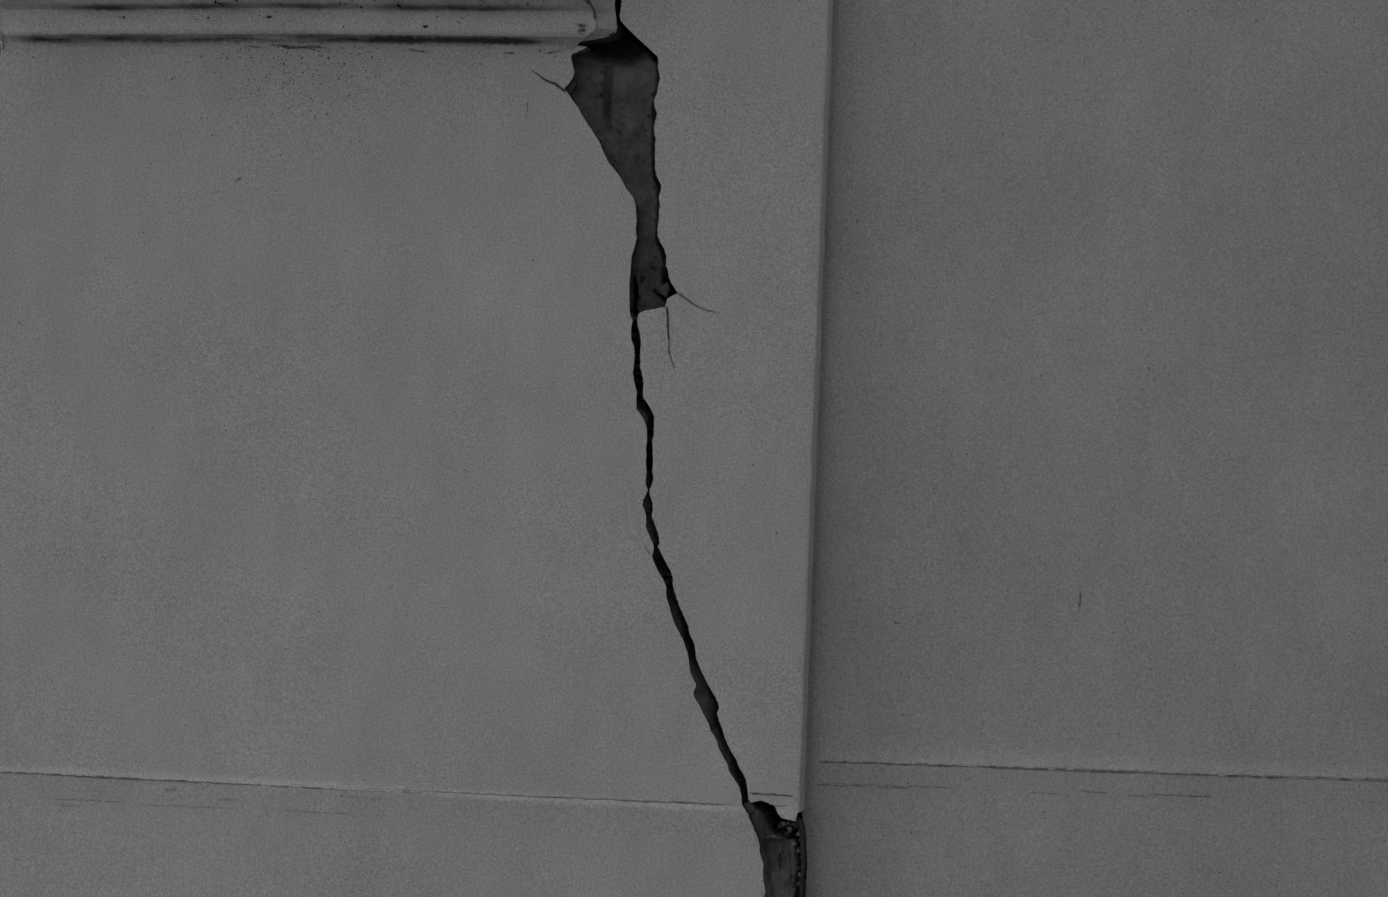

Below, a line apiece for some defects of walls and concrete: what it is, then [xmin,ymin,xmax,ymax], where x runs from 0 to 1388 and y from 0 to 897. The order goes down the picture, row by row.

crack [615,0,629,30]
flaking render [532,24,715,367]
crack [384,308,791,806]
crack [0,772,344,790]
flaking render [742,800,806,897]